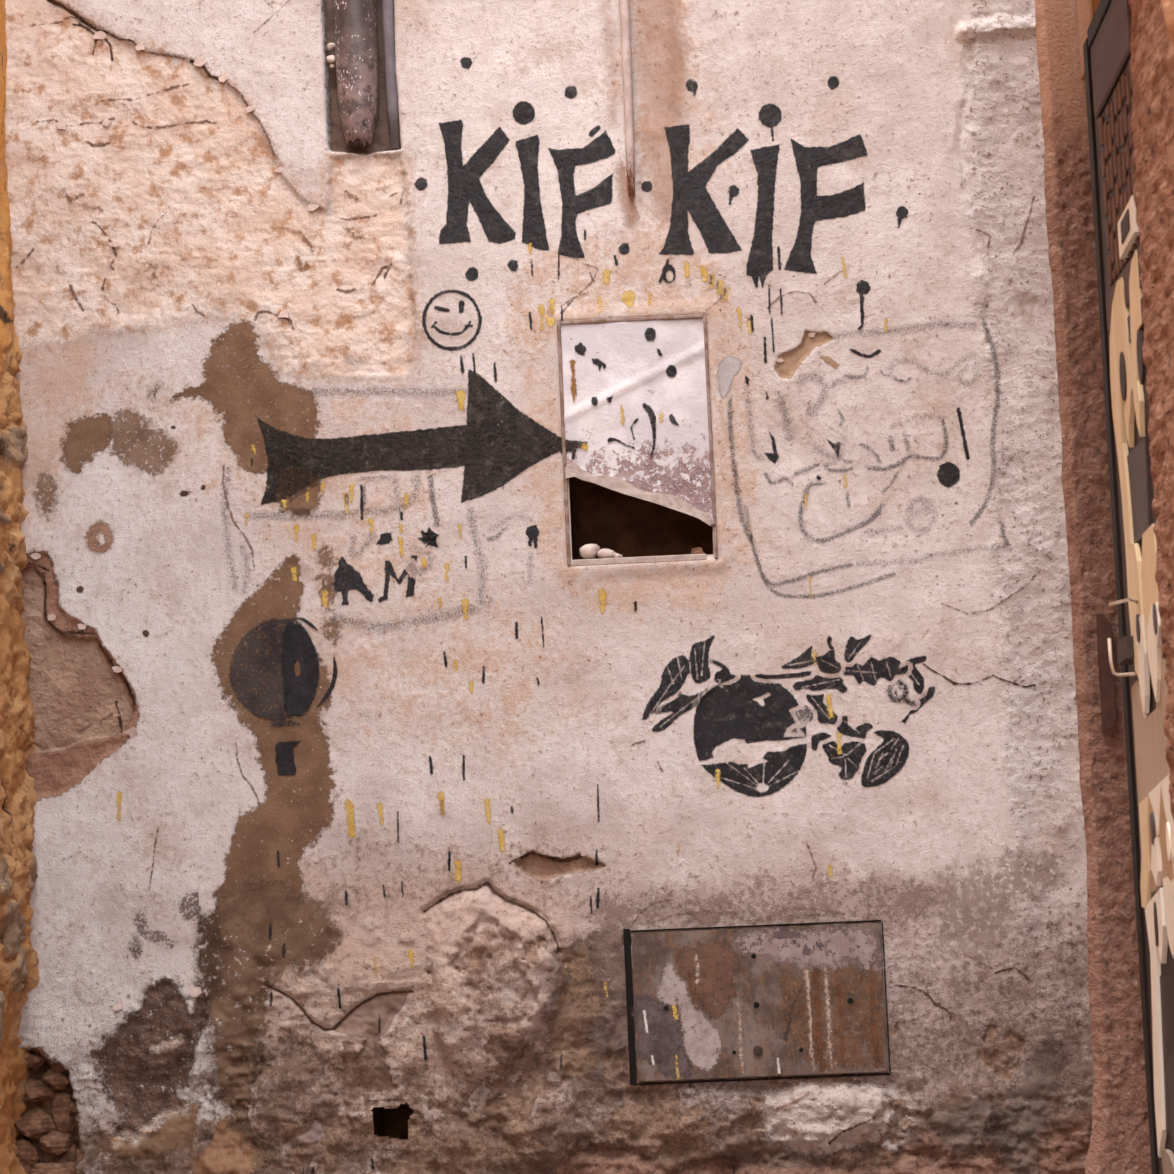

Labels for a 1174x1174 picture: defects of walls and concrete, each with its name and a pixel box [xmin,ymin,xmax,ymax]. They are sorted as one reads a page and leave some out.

crack [47,0,275,156]
spalling [0,0,419,381]
peeling [774,331,839,379]
spalling [21,550,140,801]
water stain [95,545,343,1174]
crack [423,881,562,969]
spalling [509,850,606,882]
water stain [935,850,1062,958]
crack [266,984,414,1031]
water stain [542,944,607,1077]
spalling [14,1046,85,1174]
water stain [930,1033,1065,1174]